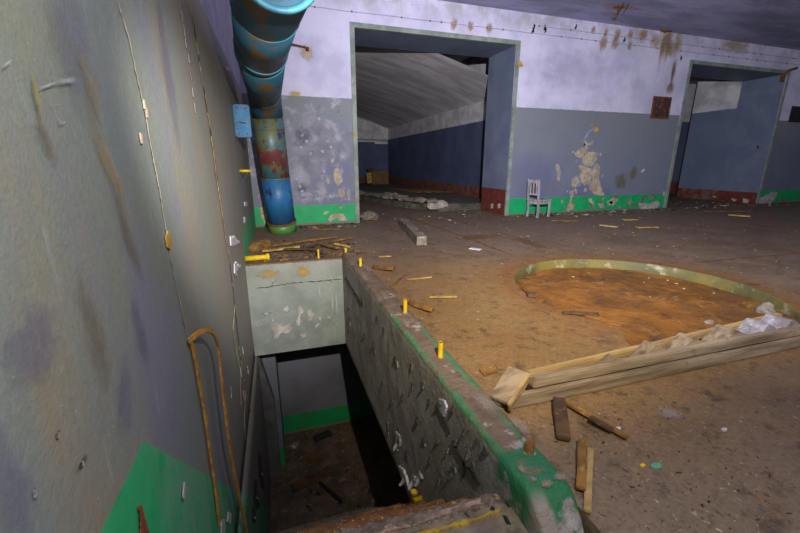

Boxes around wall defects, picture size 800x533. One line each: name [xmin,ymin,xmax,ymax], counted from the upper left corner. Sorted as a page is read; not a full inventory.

rust [600,30,680,59]
peeling [292,117,351,222]
peeling [560,124,665,213]
crack [259,277,362,306]
peeling [261,305,332,339]
peeling [429,397,456,417]
spalling [386,421,424,491]